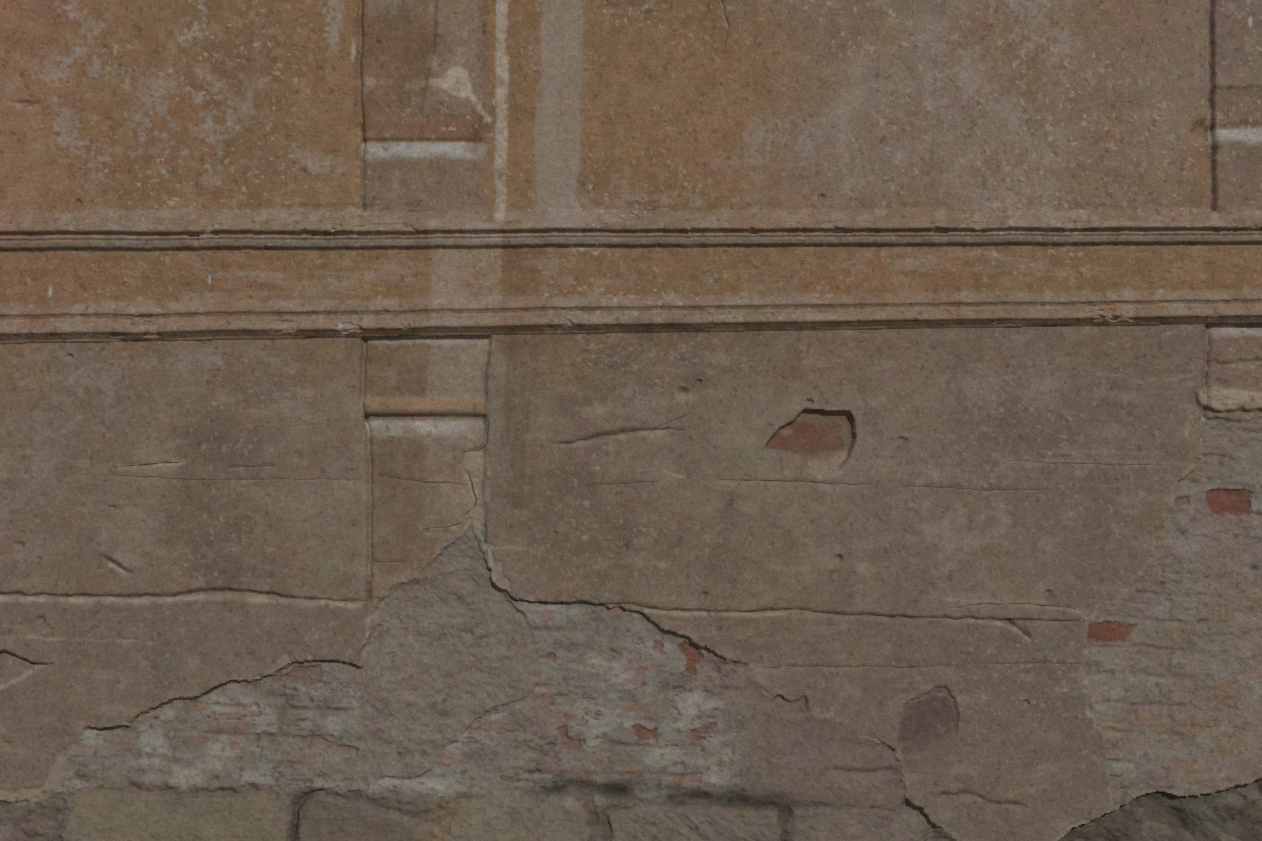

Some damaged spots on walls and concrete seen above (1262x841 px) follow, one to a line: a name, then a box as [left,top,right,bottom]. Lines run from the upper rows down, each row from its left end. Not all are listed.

crack [551,411,691,444]
spalling [763,407,831,475]
crack [0,555,363,601]
crack [540,602,1090,664]
spalling [0,649,54,691]
spalling [56,534,962,811]
crack [759,663,938,671]
spalling [1058,779,1262,841]